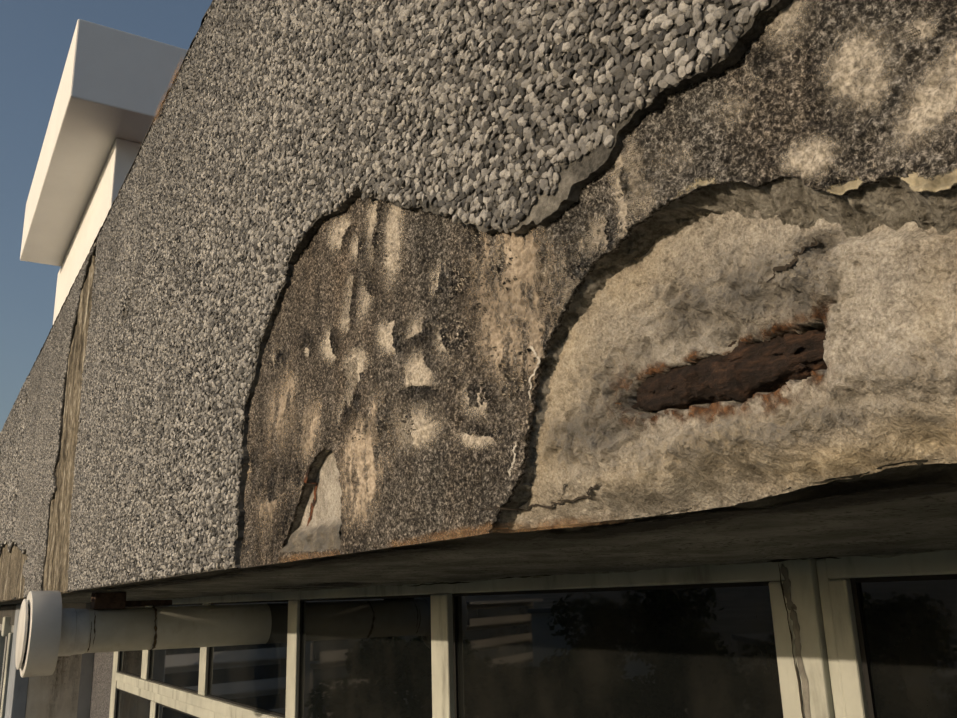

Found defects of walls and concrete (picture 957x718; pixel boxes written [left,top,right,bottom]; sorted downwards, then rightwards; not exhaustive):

efflorescence [825,35,890,107]
efflorescence [897,40,957,145]
leakage [782,138,863,195]
leakage [898,169,957,192]
efflorescence [328,199,403,332]
leakage [430,137,664,399]
peeling [236,0,957,569]
efflorescence [378,320,396,355]
rust [615,301,832,425]
leakage [321,331,439,522]
crack [480,484,598,511]
peeling [0,544,28,602]